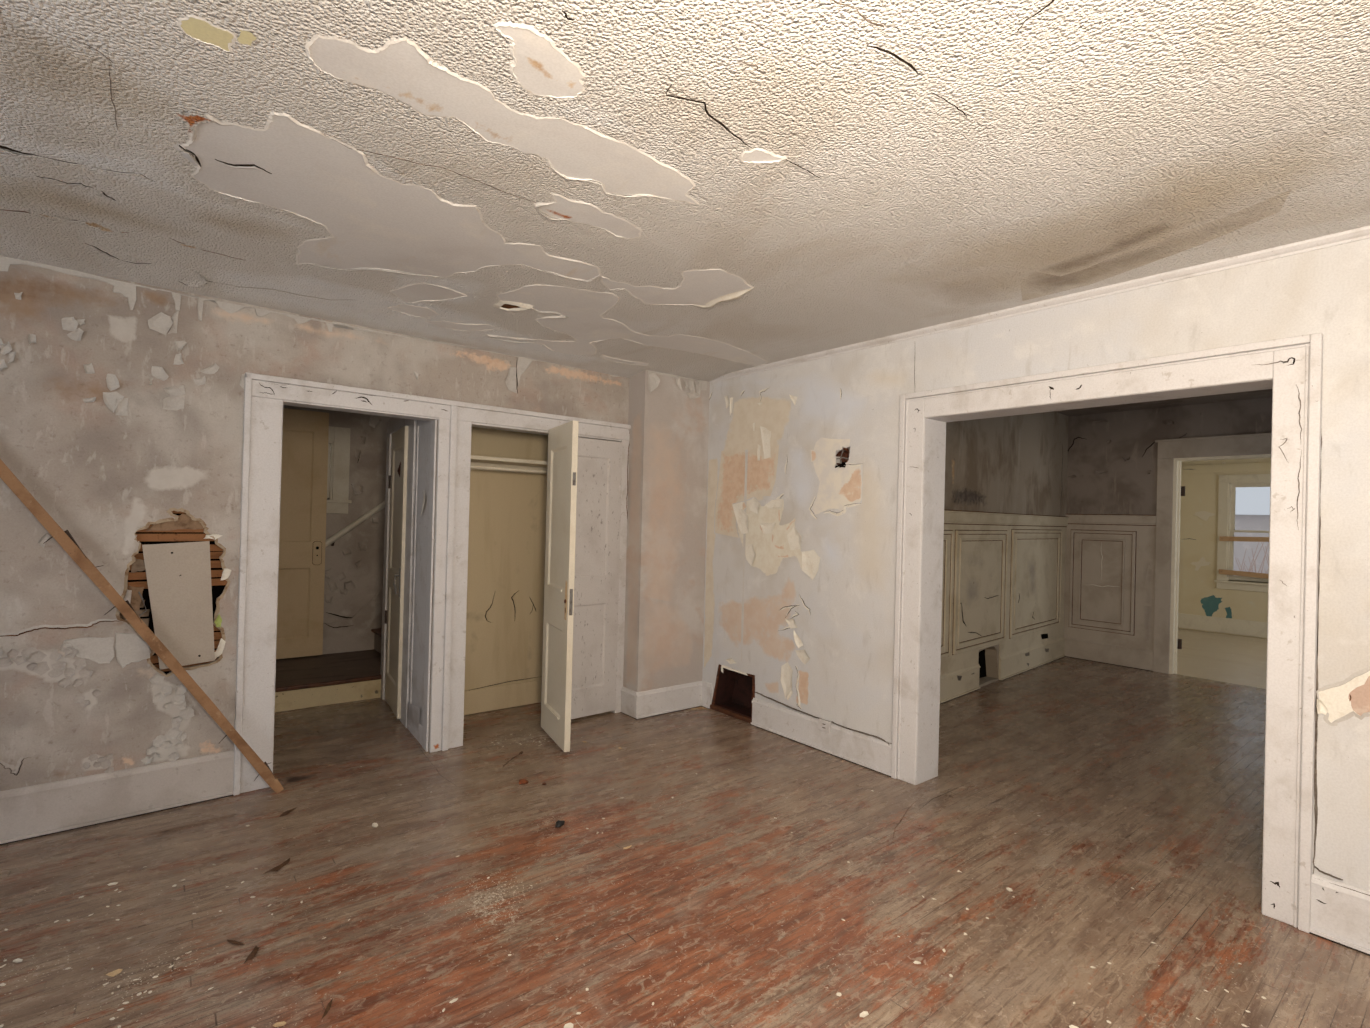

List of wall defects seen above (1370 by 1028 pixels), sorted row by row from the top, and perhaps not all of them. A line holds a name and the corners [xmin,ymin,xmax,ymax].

crack [1017,0,1061,33]
peeling [493,21,586,99]
crack [819,0,967,120]
peeling [304,34,700,239]
crack [663,84,752,149]
crack [784,159,821,179]
peeling [0,110,768,416]
peeling [732,436,863,581]
flaking render [0,508,231,767]
peeling [780,619,810,700]
peeling [1316,666,1370,726]